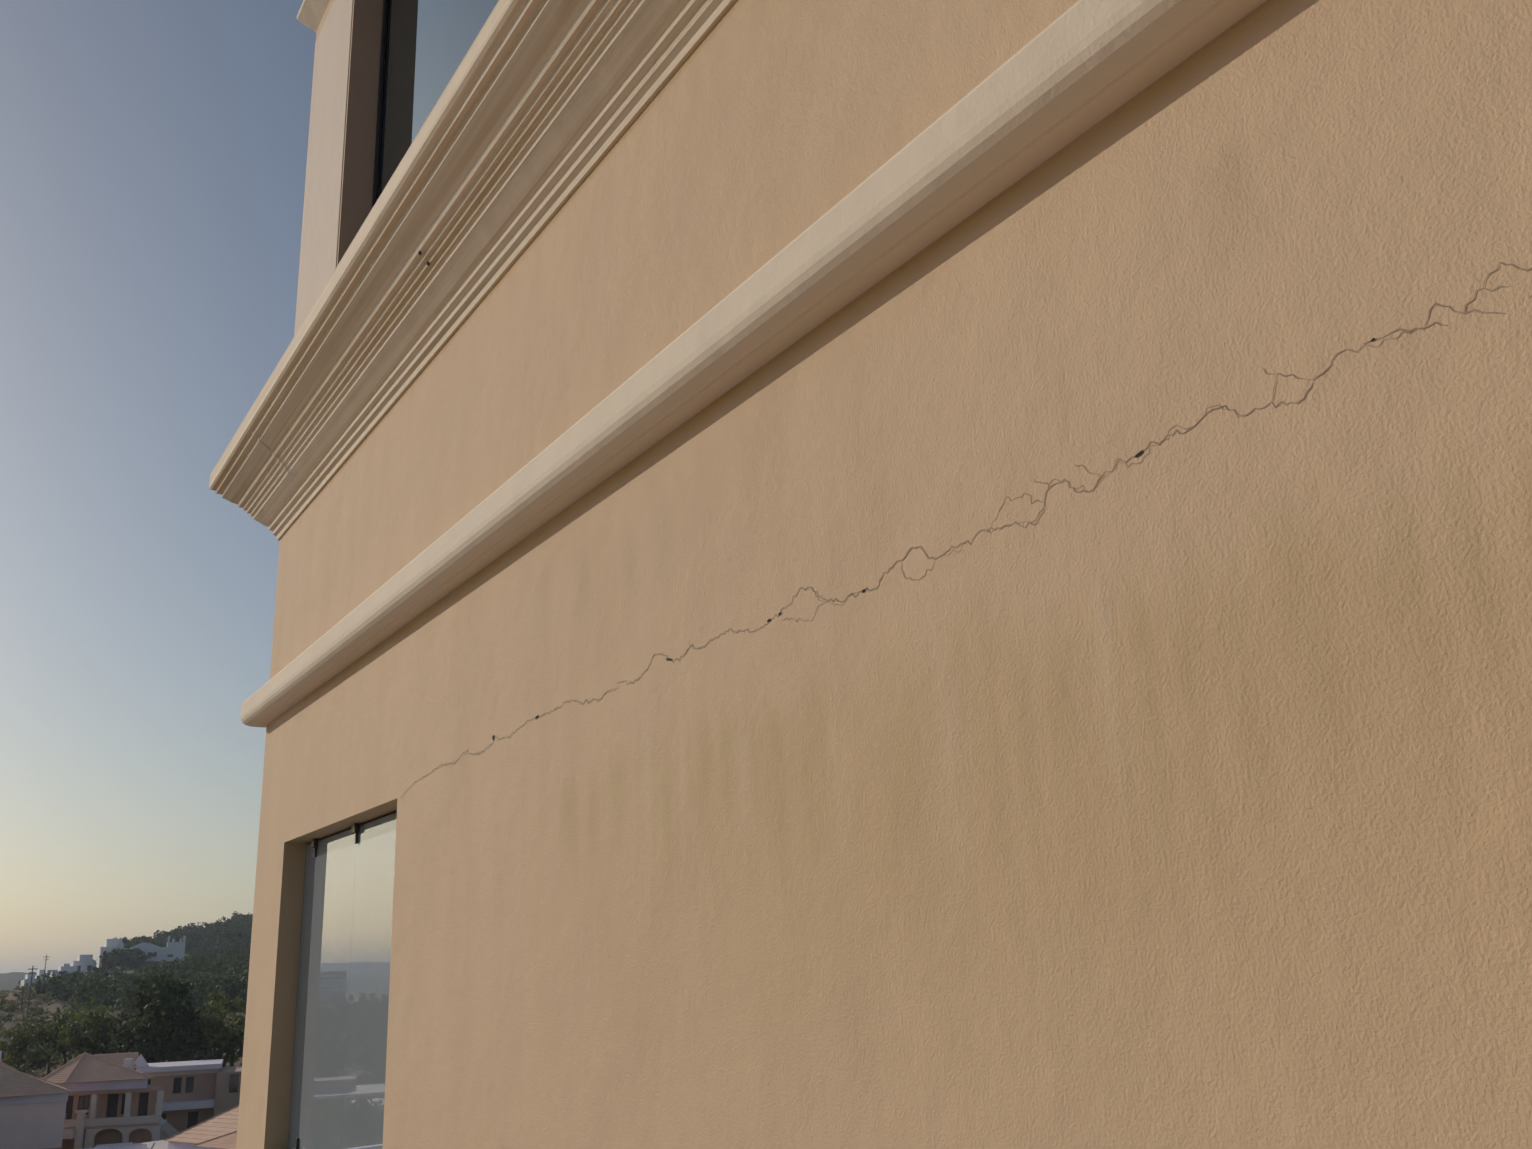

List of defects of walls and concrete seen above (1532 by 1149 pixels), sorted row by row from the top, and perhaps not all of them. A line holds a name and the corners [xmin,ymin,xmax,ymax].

crack [401,262,1532,797]
leakage [523,330,1532,1149]